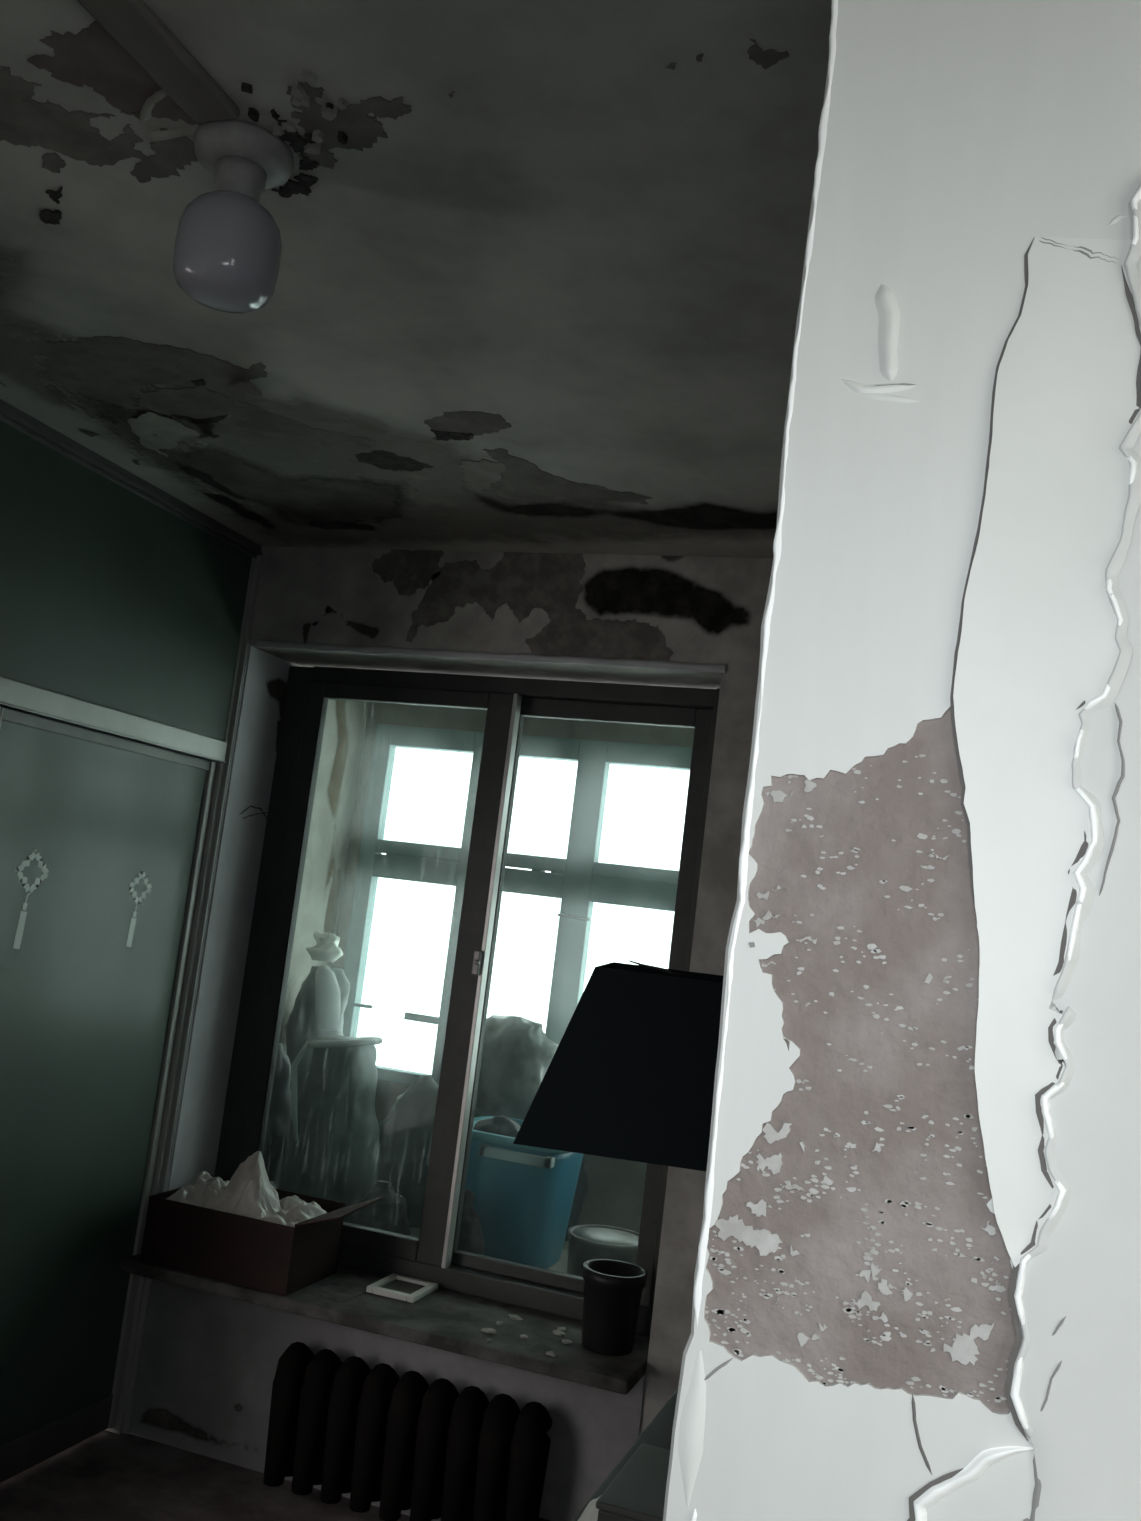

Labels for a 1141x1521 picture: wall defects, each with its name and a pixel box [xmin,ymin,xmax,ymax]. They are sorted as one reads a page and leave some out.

peeling [0,20,205,225]
peeling [241,71,412,198]
leakage [0,250,777,634]
peeling [424,411,653,505]
peeling [372,549,674,661]
peeling [693,0,1141,1413]
crack [907,184,1141,1521]
crack [704,1358,733,1380]
crack [690,1509,698,1521]